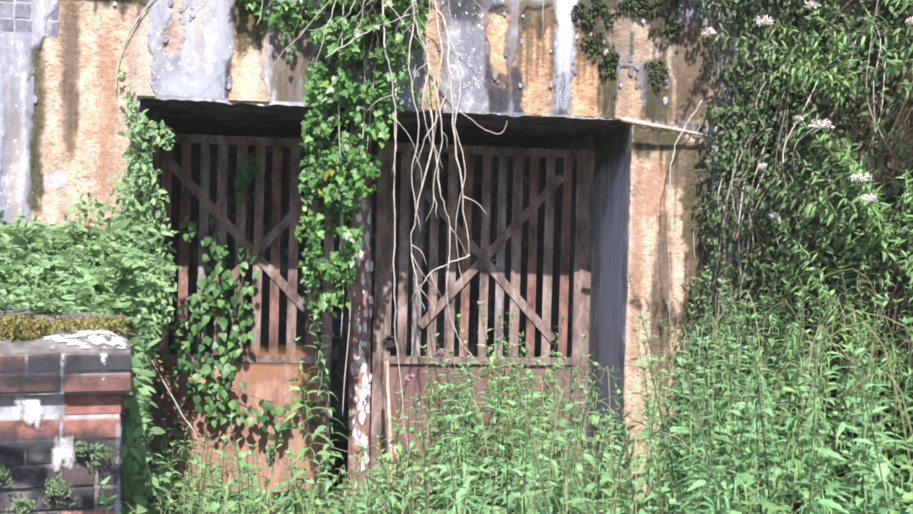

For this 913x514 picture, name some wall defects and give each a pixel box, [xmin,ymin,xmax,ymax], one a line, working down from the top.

water stain [19,44,63,211]
water stain [62,3,79,152]
spalling [31,0,156,232]
spalling [163,0,195,55]
spalling [226,27,269,103]
spalling [485,6,556,116]
water stain [518,0,614,110]
spalling [568,4,721,511]
peeling [349,200,373,472]